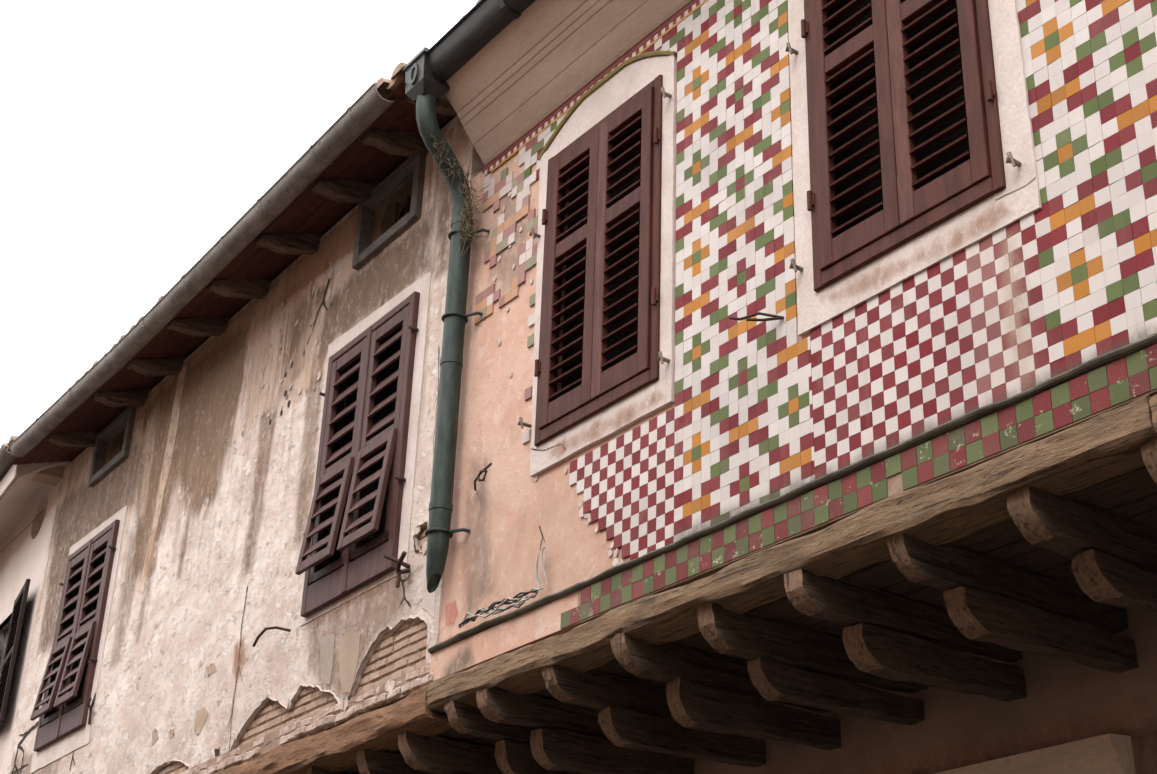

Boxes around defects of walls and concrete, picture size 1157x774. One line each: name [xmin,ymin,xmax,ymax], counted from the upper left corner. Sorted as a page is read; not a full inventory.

damp [41,179,451,647]
flaking render [214,614,430,757]